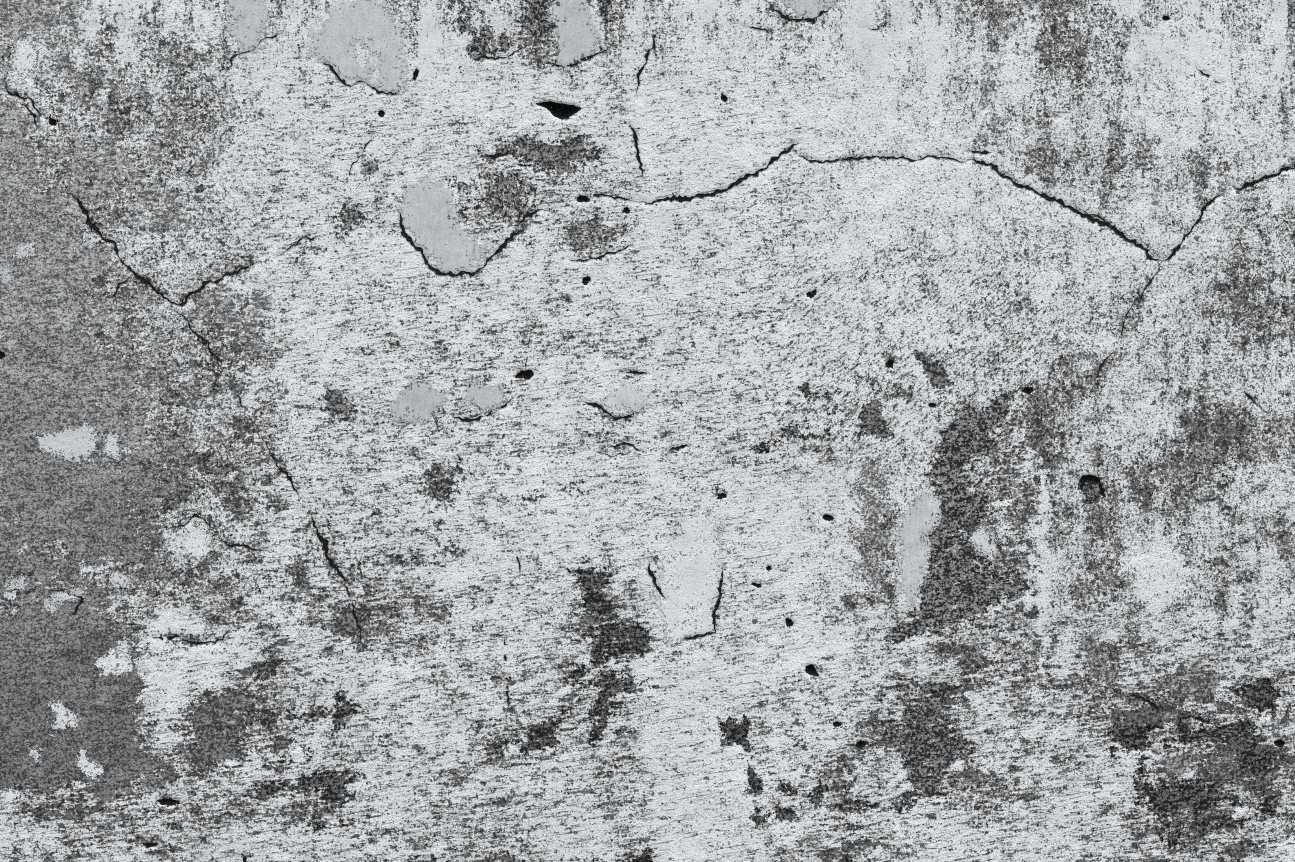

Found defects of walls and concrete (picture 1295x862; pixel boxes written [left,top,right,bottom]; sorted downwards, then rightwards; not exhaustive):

peeling [309,0,410,98]
peeling [450,0,625,72]
crack [636,35,657,93]
peeling [770,0,838,22]
spalling [357,153,389,182]
peeling [397,123,638,277]
leakage [0,0,318,528]
crack [595,125,1295,385]
spalling [0,38,375,835]
crack [65,190,364,645]
spalling [412,455,472,513]
crack [54,590,83,618]